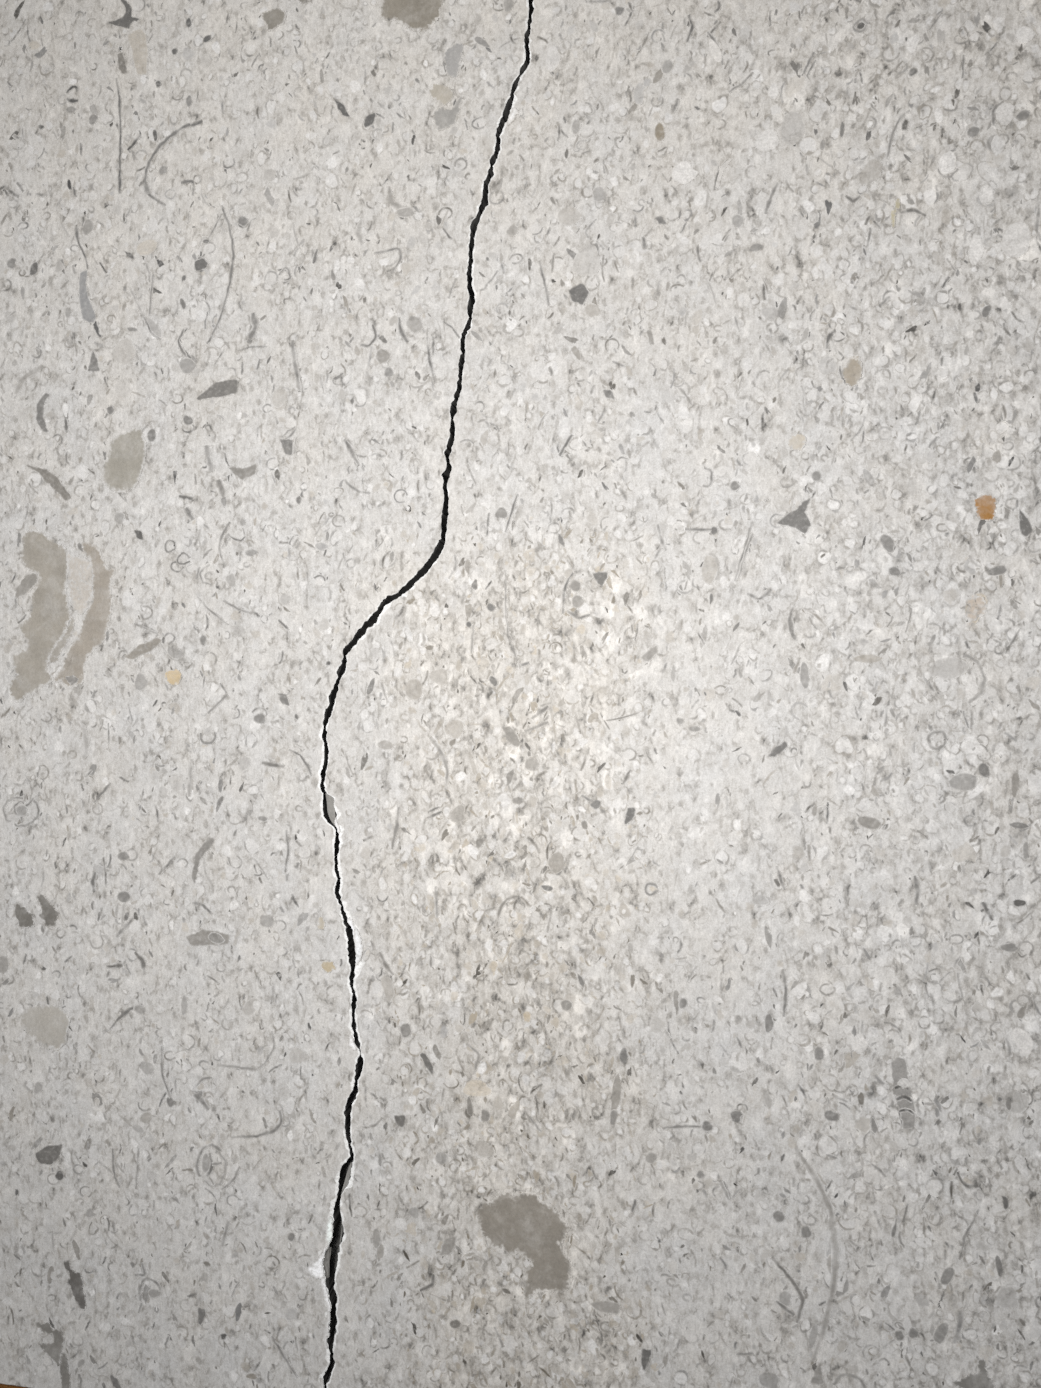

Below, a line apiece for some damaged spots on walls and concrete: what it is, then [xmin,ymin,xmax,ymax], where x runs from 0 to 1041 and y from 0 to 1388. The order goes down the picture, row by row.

crack [307,0,535,1388]